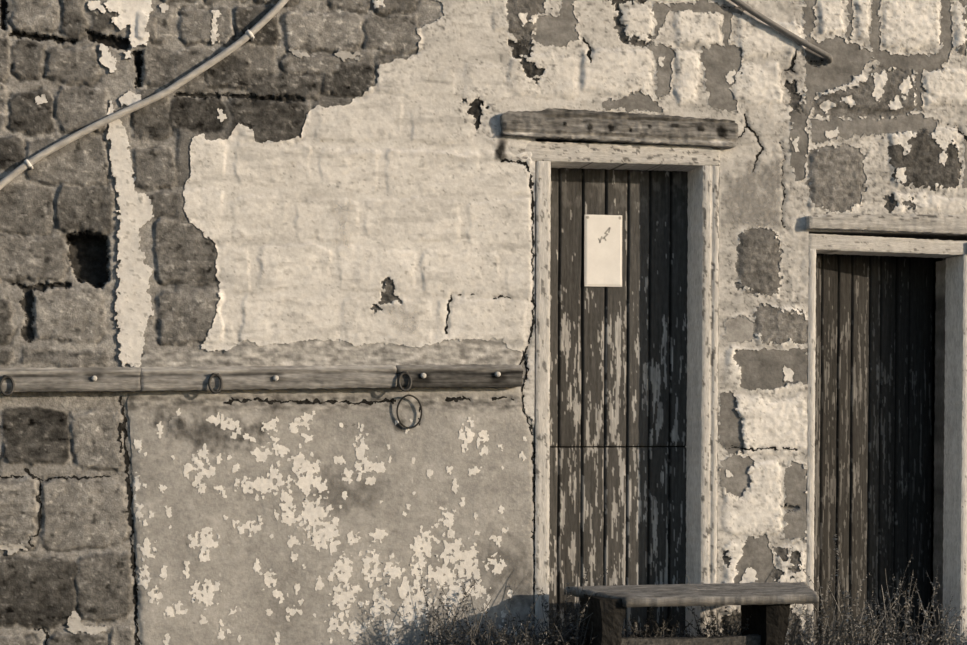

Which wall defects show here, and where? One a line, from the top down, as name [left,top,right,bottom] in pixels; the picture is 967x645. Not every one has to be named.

peeling [66,91,154,367]
peeling [87,0,169,73]
peeling [602,0,744,113]
crack [738,114,786,228]
peeling [784,0,967,214]
crack [223,397,396,406]
crack [444,158,536,614]
peeling [717,227,808,498]
crack [0,396,142,645]
peeling [136,527,242,642]
peeling [171,411,523,645]
peeling [722,461,807,583]